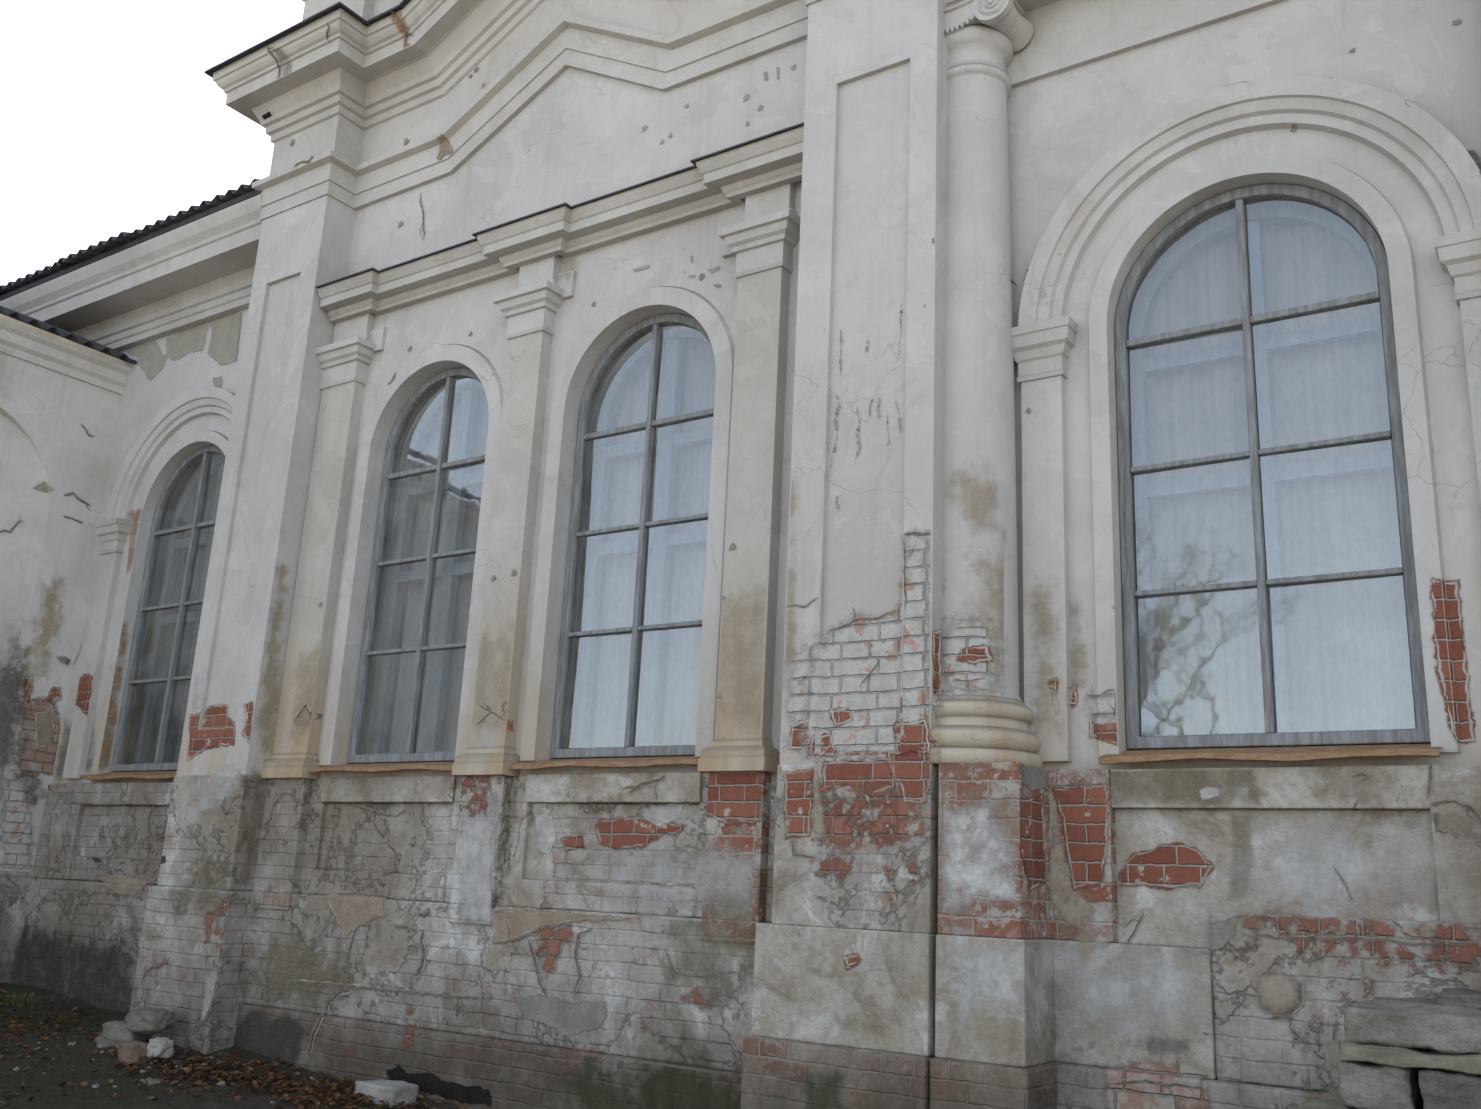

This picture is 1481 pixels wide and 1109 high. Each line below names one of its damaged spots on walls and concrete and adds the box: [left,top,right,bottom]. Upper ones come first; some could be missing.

water stain [0,666,27,765]
flaking render [0,646,96,870]
water stain [39,583,59,657]
water stain [57,728,70,775]
water stain [85,624,126,770]
flaking render [187,676,253,761]
flaking render [707,530,999,878]
flaking render [1430,578,1475,744]
flaking render [536,804,687,856]
flaking render [883,863,917,883]
flaking render [1021,784,1214,891]
flaking render [1242,915,1481,973]